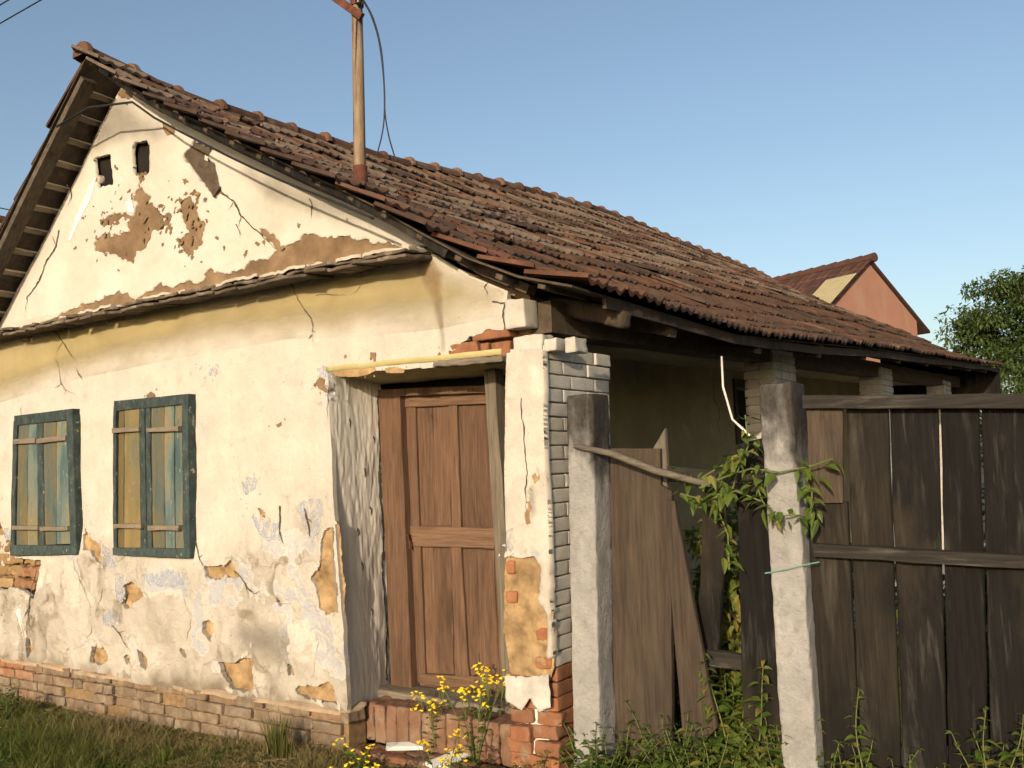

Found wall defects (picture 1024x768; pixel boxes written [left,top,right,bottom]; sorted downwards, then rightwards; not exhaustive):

peeling [59,142,401,324]
crack [221,192,275,249]
crack [291,272,363,340]
crack [55,331,82,395]
spalling [83,525,186,668]
spalling [193,556,239,582]
spalling [301,496,346,624]
spalling [223,651,258,698]
spalling [298,682,341,711]
spalling [498,529,575,768]